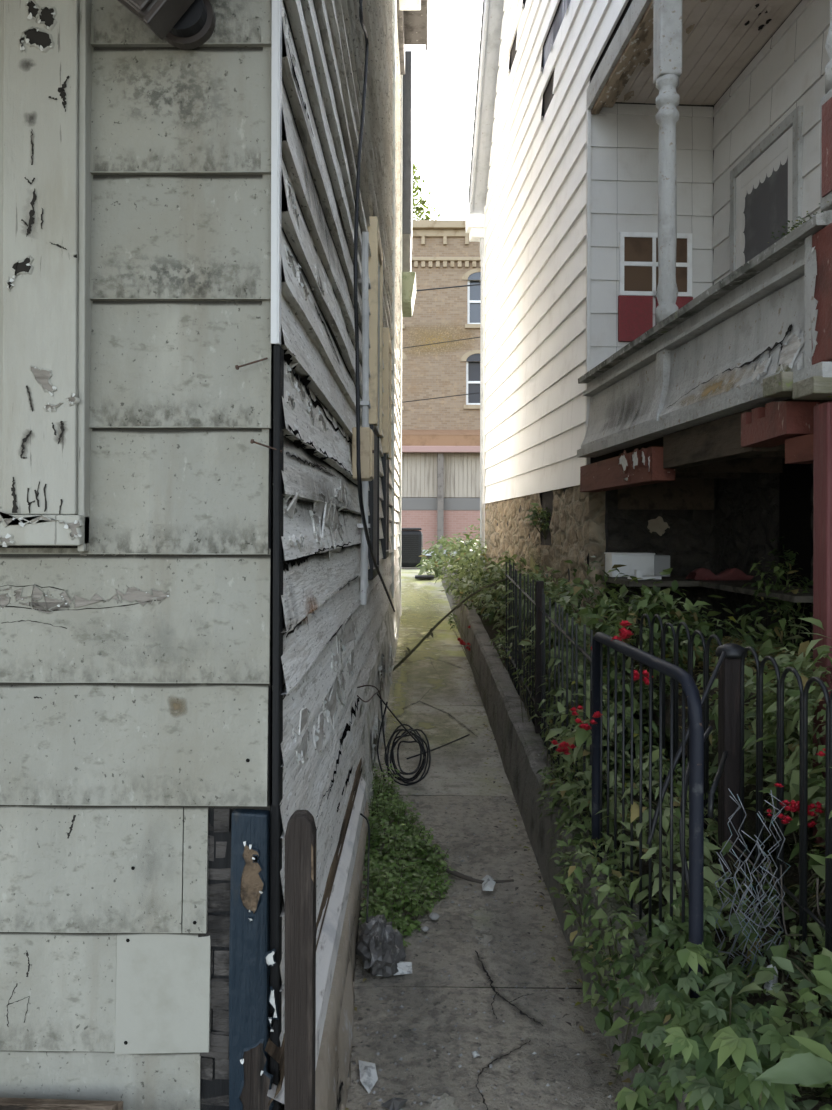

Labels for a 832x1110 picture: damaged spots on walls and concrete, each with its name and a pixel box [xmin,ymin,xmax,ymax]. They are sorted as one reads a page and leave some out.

peeling [18,0,58,54]
spalling [48,76,69,112]
peeling [5,255,34,292]
peeling [30,366,80,412]
crack [286,452,336,477]
peeling [618,448,651,482]
peeling [0,512,83,547]
peeling [0,586,169,614]
peeling [238,841,266,922]
peeling [264,949,277,968]
peeling [238,986,279,1110]
crack [475,951,544,1110]